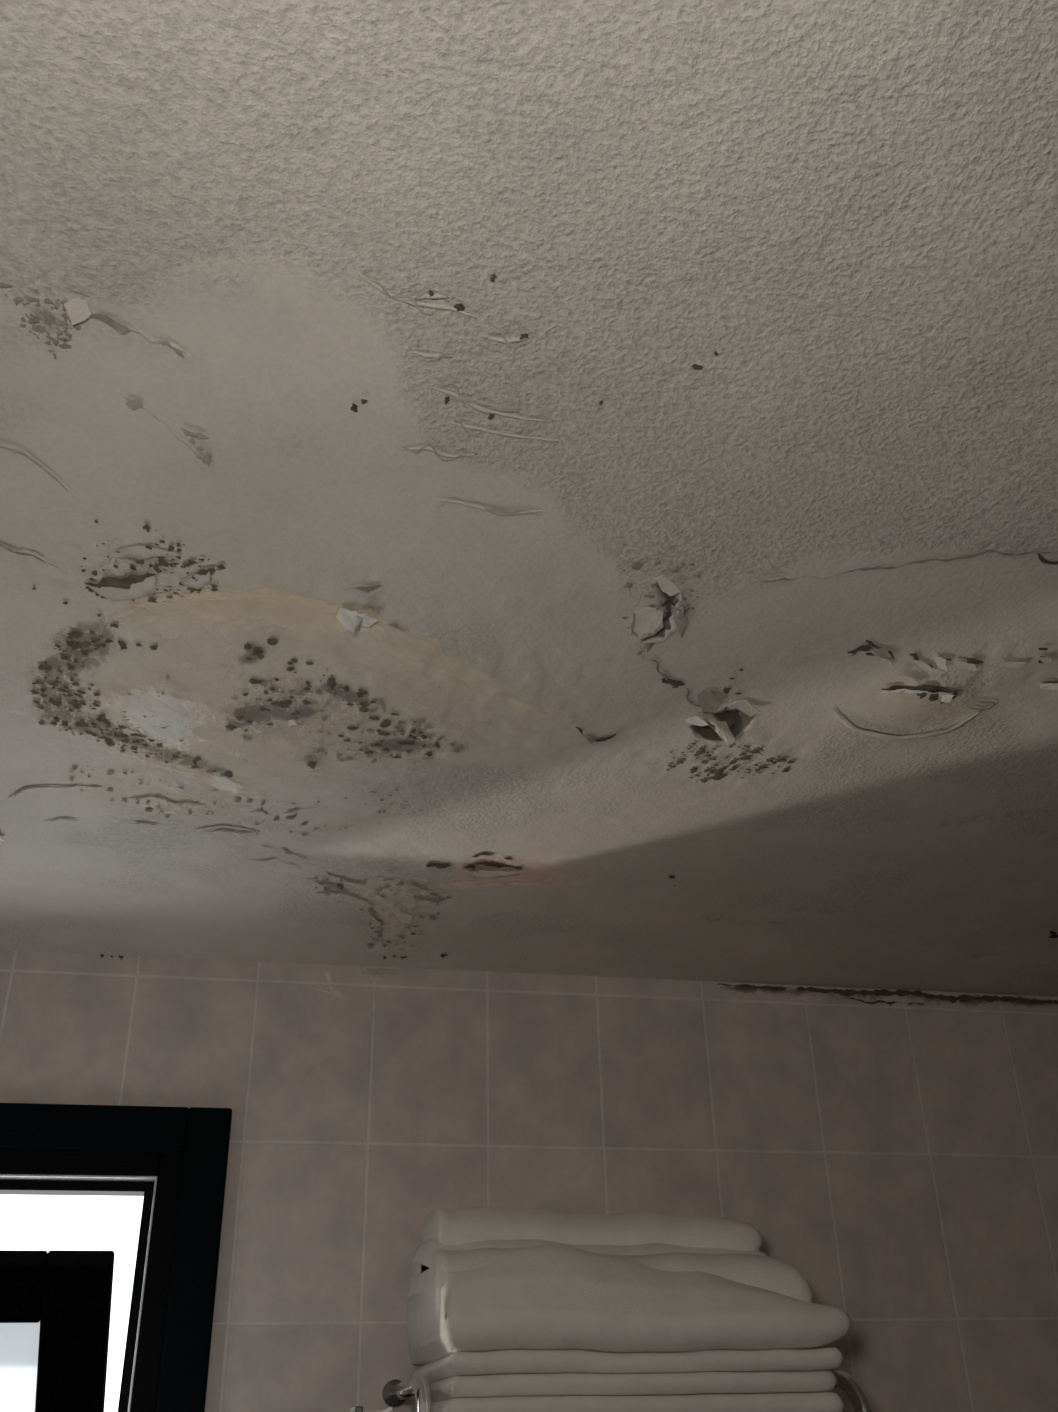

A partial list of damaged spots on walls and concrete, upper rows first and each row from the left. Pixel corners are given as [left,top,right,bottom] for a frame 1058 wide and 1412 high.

spalling [0,282,185,359]
flaking render [358,272,477,317]
flaking render [432,383,559,442]
peeling [0,524,226,617]
damp [29,621,241,793]
peeling [215,638,468,769]
damp [576,726,616,744]
spalling [617,561,794,783]
peeling [909,653,983,673]
damp [314,872,450,959]
crack [717,983,1058,1006]